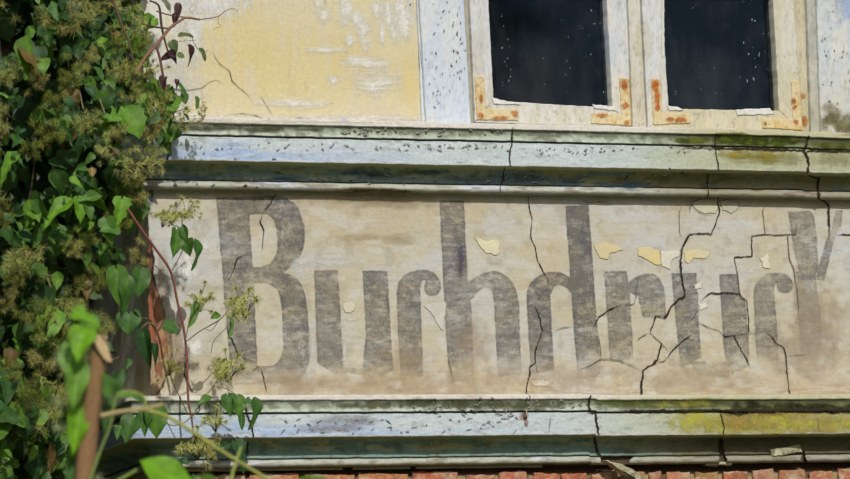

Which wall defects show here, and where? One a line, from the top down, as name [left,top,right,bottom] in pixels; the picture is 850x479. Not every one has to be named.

peeling [168,0,252,73]
peeling [309,0,397,92]
peeling [176,99,510,152]
rust [652,81,660,111]
water stain [675,132,804,163]
water stain [813,104,850,162]
crack [528,197,549,283]
spalling [637,246,710,270]
crack [581,133,850,448]
crack [526,304,565,406]
crack [588,395,603,458]
water stain [595,399,850,434]